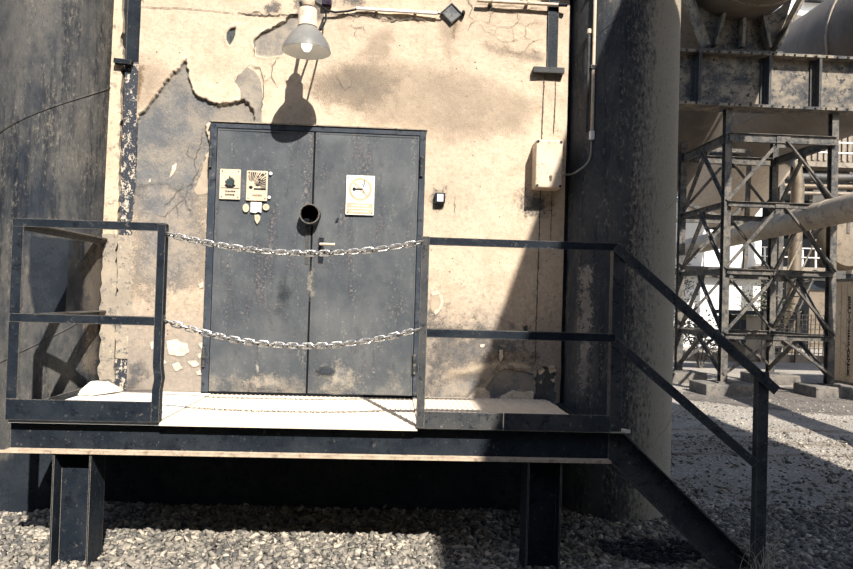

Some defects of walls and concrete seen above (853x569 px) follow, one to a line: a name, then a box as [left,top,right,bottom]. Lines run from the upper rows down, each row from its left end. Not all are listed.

crack [140,0,298,110]
spalling [227,27,236,45]
flaking render [253,15,298,57]
crack [450,0,545,54]
crack [541,76,556,140]
flaking render [130,60,262,298]
crack [535,190,552,399]
peeling [164,339,203,375]
flaking render [433,361,556,403]